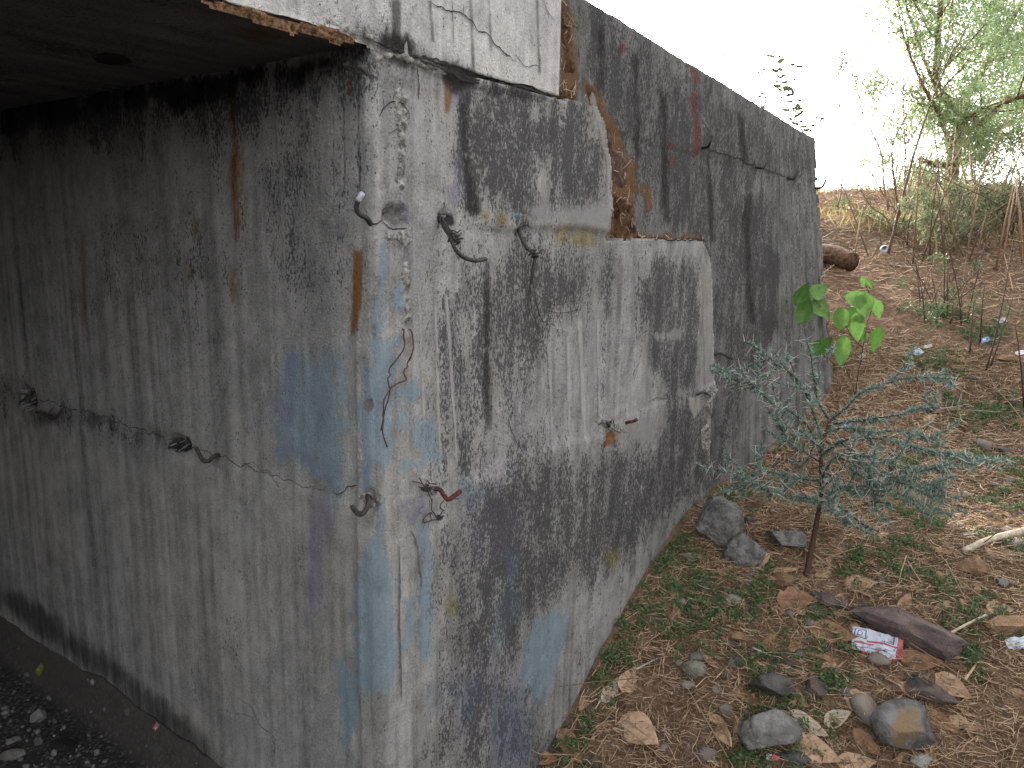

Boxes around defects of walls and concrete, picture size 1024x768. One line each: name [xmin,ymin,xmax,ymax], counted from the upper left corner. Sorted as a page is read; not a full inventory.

spalling [201,0,379,51]
crack [375,1,555,133]
rust [230,96,244,239]
rust [351,250,362,335]
crack [1,386,361,506]
damp [567,321,588,444]
rust [603,431,616,448]
damp [689,398,700,417]